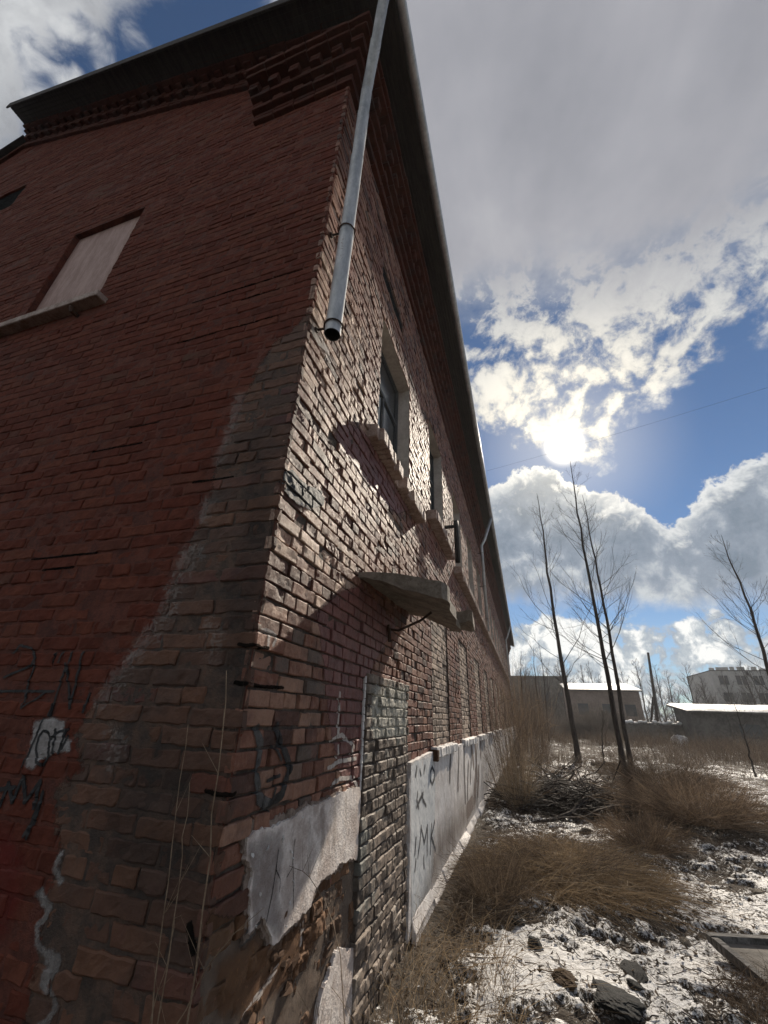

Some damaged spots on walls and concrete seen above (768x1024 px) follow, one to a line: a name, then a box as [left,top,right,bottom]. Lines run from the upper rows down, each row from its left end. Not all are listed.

peeling [22,311,361,1024]